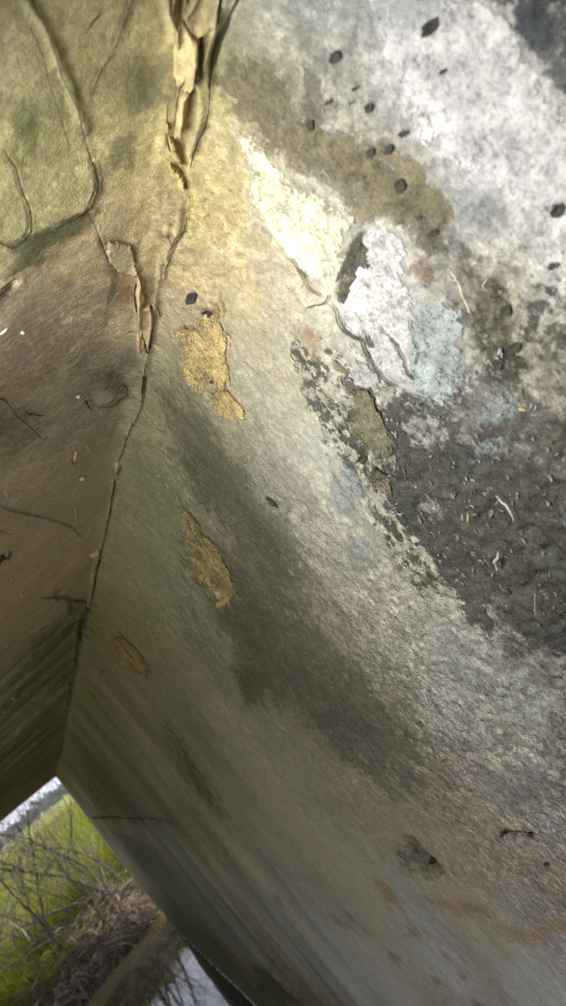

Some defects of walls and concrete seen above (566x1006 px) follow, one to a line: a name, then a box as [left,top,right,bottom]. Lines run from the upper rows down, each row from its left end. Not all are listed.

peeling [165,0,220,193]
water stain [384,0,566,226]
crack [0,0,237,462]
spalling [171,299,244,421]
crack [60,552,101,755]
spalling [177,507,242,615]
water stain [160,390,430,800]
water stain [291,343,566,750]